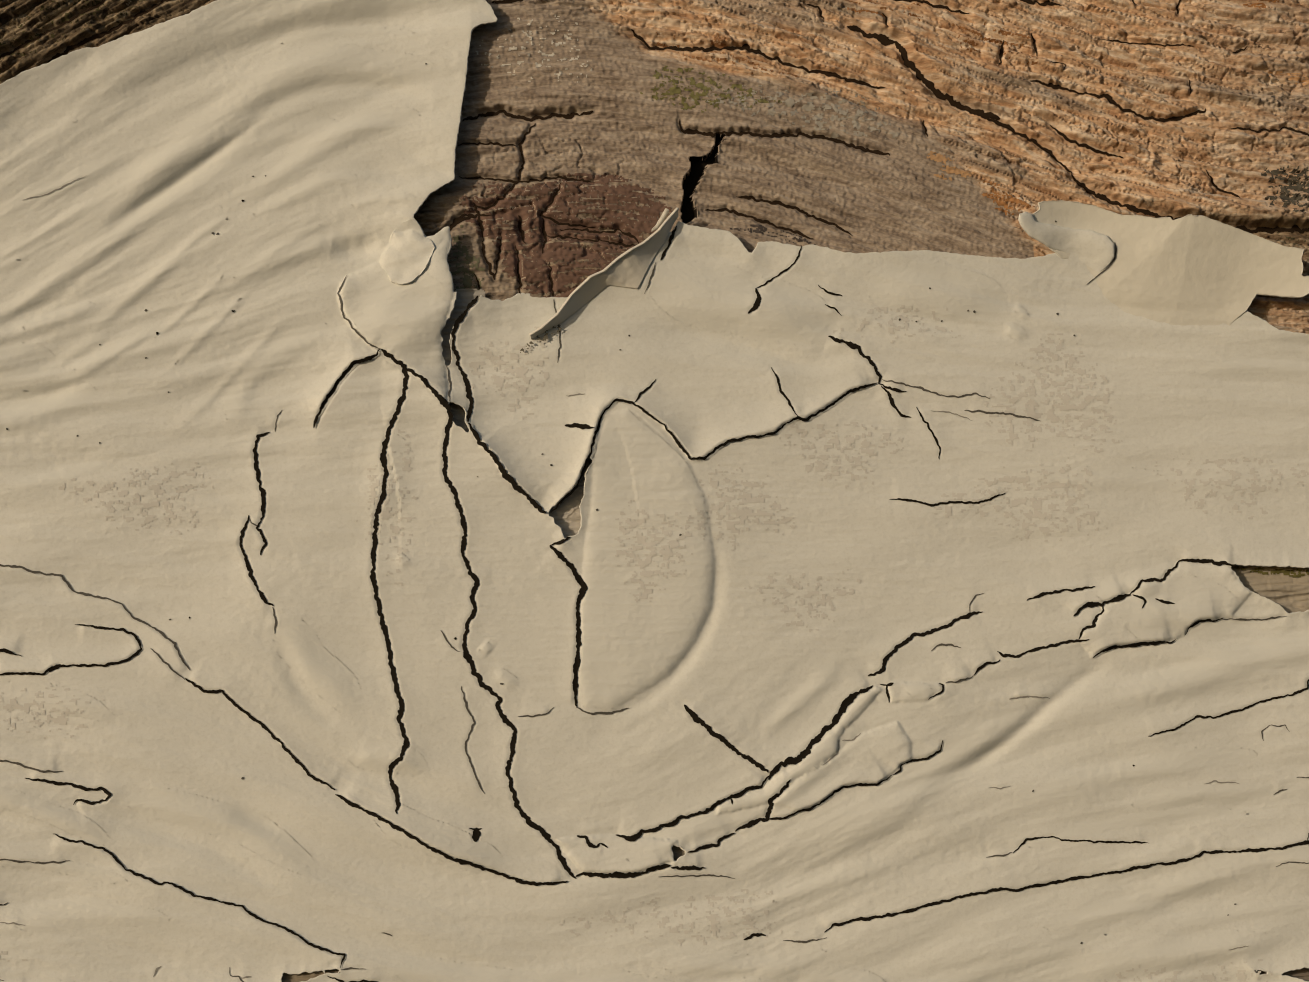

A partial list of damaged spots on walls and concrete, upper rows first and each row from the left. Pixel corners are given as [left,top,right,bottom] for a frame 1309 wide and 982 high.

peeling [379,219,435,285]
peeling [441,289,485,366]
peeling [449,402,469,432]
crack [0,110,1309,886]
crack [0,834,378,982]
crack [744,833,1309,943]
peeling [282,969,339,982]
peeling [1282,968,1309,981]